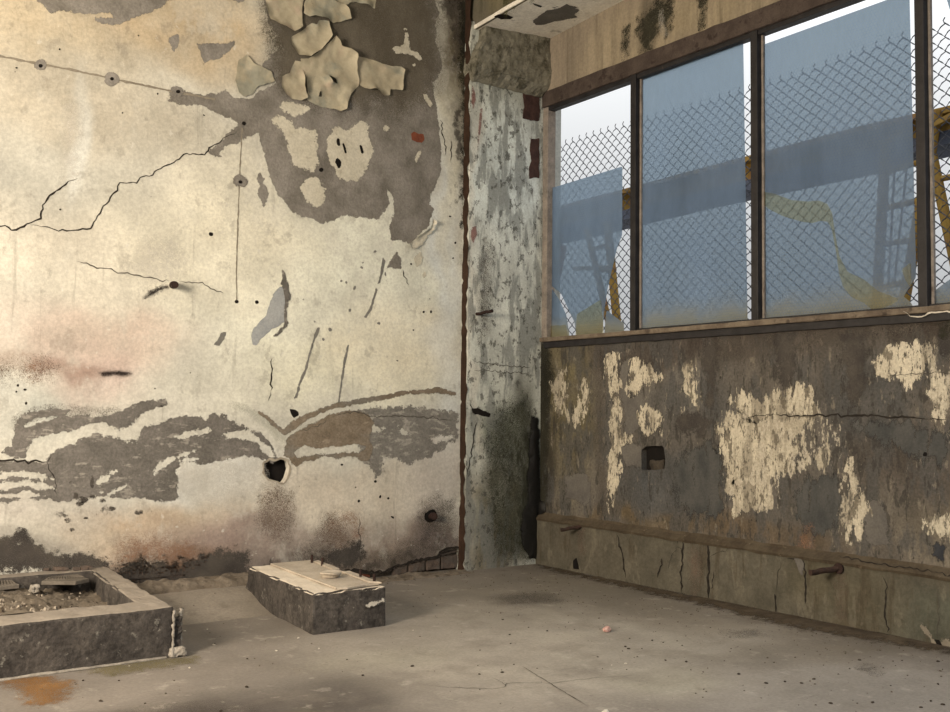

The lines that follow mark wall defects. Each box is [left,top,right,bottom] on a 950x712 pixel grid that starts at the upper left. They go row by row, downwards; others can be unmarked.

flaking render [37,0,167,25]
peeling [533,3,579,25]
leakage [620,0,675,62]
leakage [696,0,708,32]
flaking render [157,0,448,278]
crack [0,131,237,232]
crack [78,261,221,292]
peeling [251,270,304,345]
flaking render [619,358,645,467]
crack [752,412,945,420]
spalling [262,457,291,485]
leakage [479,344,557,566]